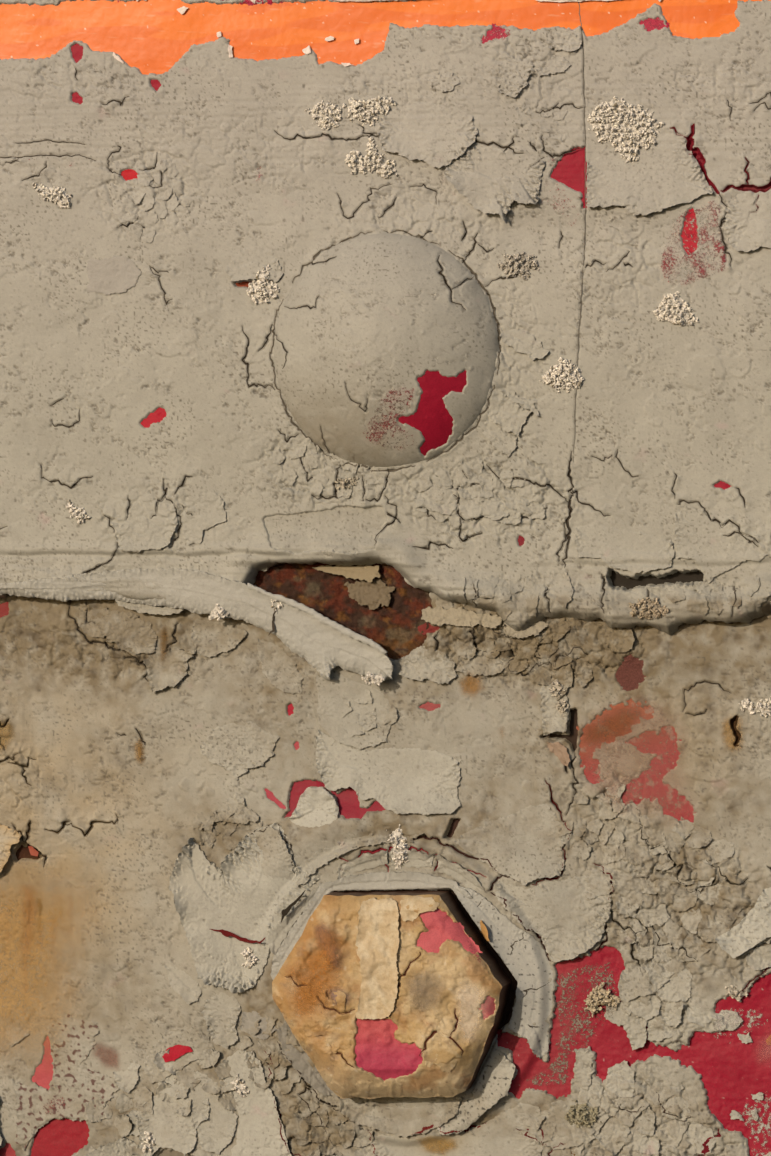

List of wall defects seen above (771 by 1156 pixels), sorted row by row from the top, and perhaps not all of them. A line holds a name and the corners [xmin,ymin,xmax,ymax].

peeling [0,0,771,97]
crack [0,140,163,188]
peeling [377,73,771,284]
crack [670,124,771,267]
crack [242,0,639,676]
peeling [366,370,467,456]
peeling [110,490,227,553]
rust [253,562,432,660]
peeling [575,504,771,620]
crack [13,815,118,865]
peeling [0,568,771,1156]
crack [340,754,579,997]